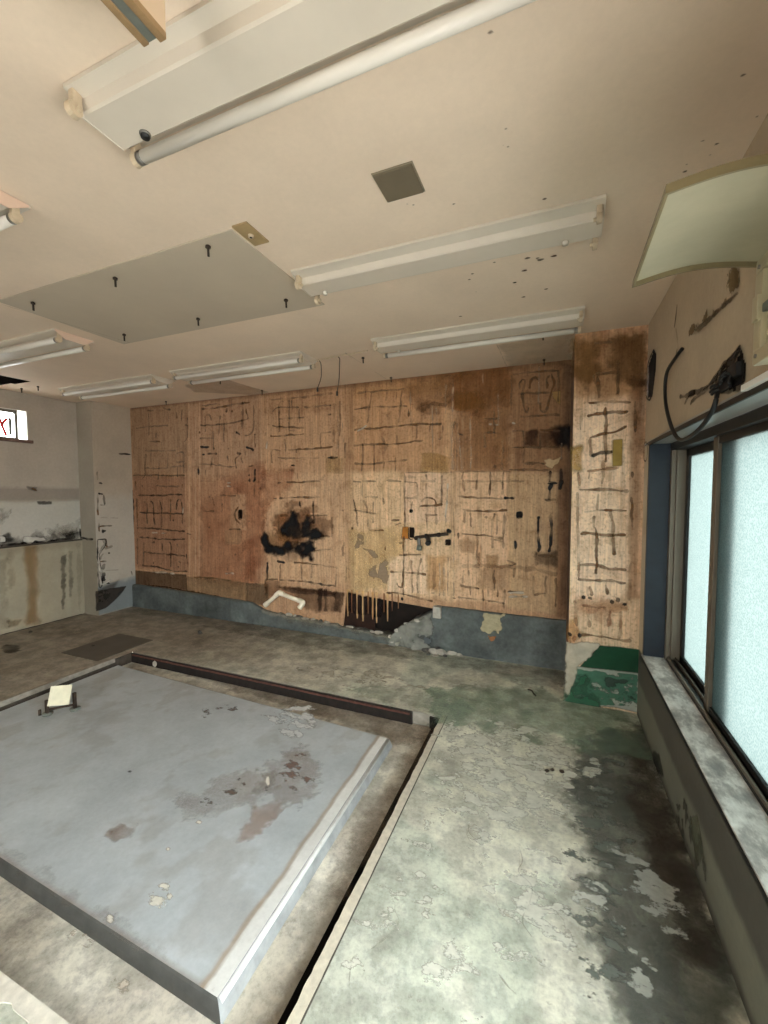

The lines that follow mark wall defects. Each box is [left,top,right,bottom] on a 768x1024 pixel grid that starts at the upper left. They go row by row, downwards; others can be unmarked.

peeling [689,268,740,336]
damp [453,334,646,606]
damp [95,400,426,623]
spalling [281,613,433,651]
peeling [480,613,505,641]
peeling [564,642,638,712]
peeling [673,799,706,881]
peeling [605,844,689,940]
peeling [483,870,657,998]